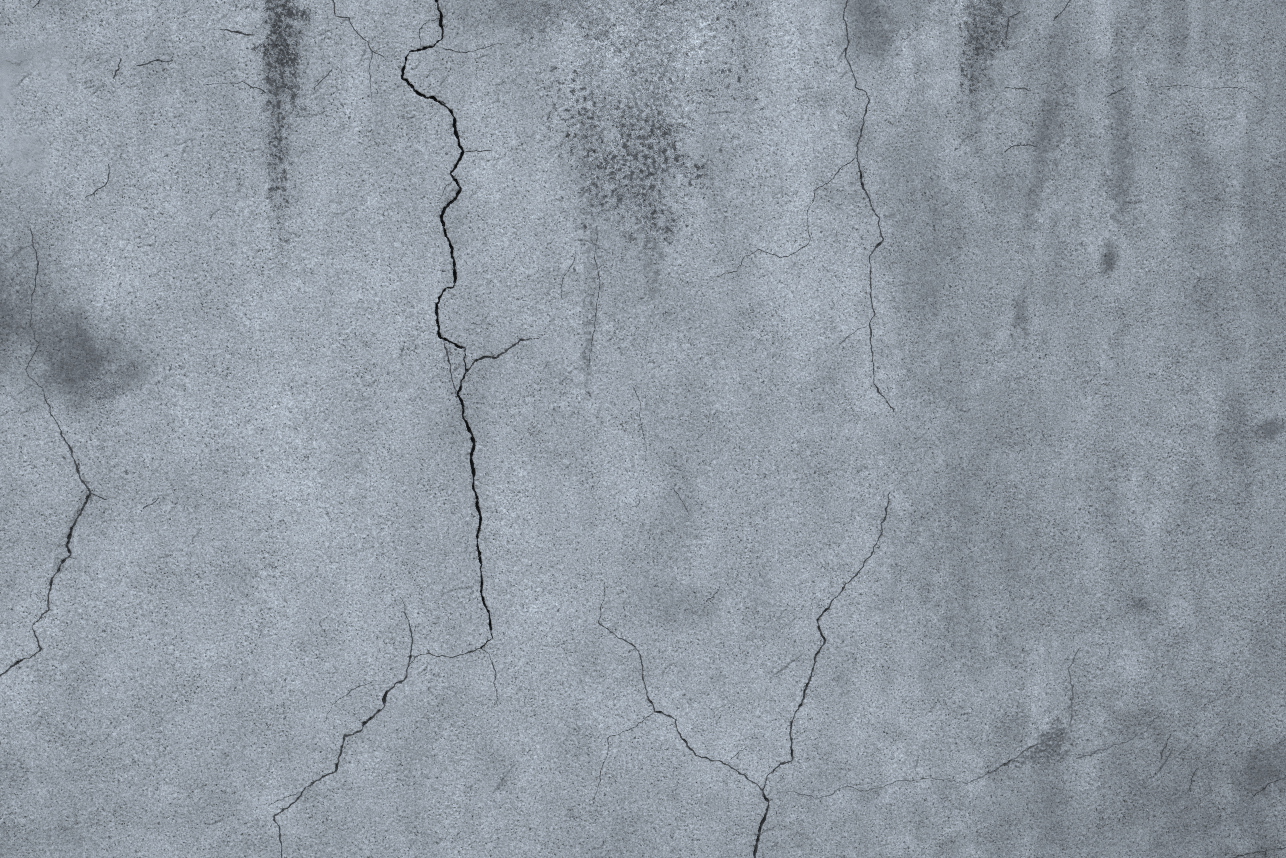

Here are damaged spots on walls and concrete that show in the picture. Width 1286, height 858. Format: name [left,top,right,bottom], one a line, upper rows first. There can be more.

damp [253,0,310,209]
crack [717,0,894,412]
crack [0,228,107,676]
crack [271,0,539,858]
crack [593,492,1171,858]